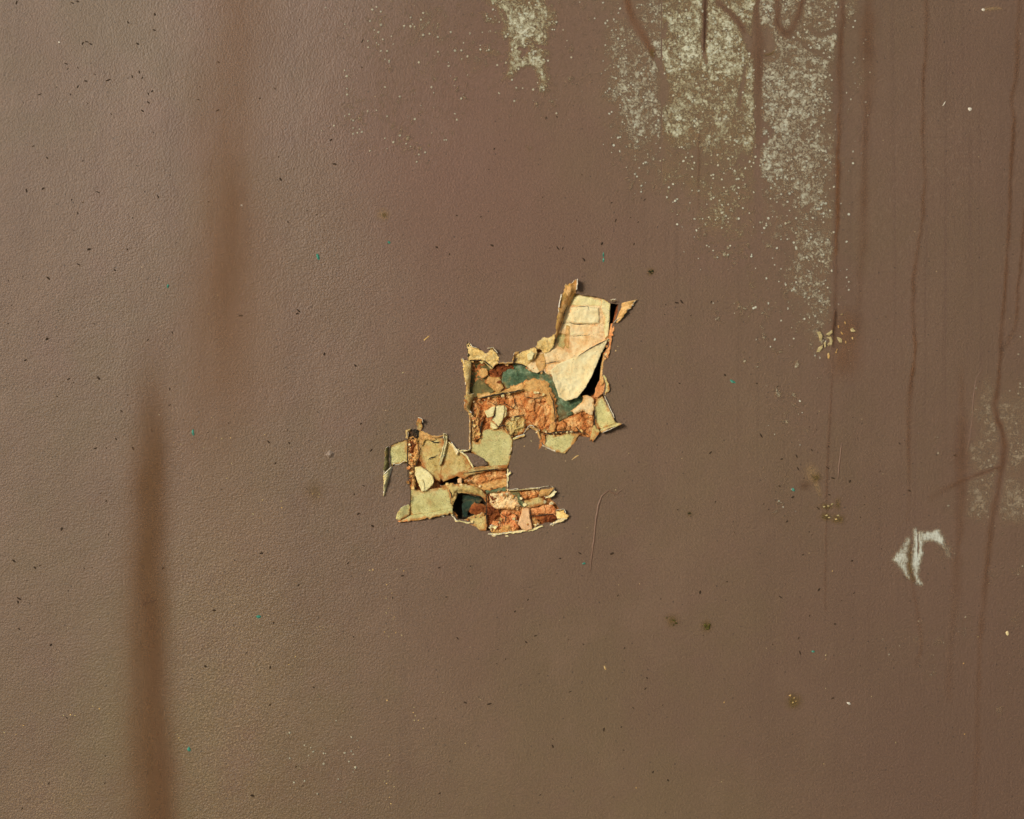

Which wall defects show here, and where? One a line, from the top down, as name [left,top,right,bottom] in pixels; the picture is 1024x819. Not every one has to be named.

water stain [367,0,870,357]
peeling [383,279,638,537]
water stain [963,341,1024,587]